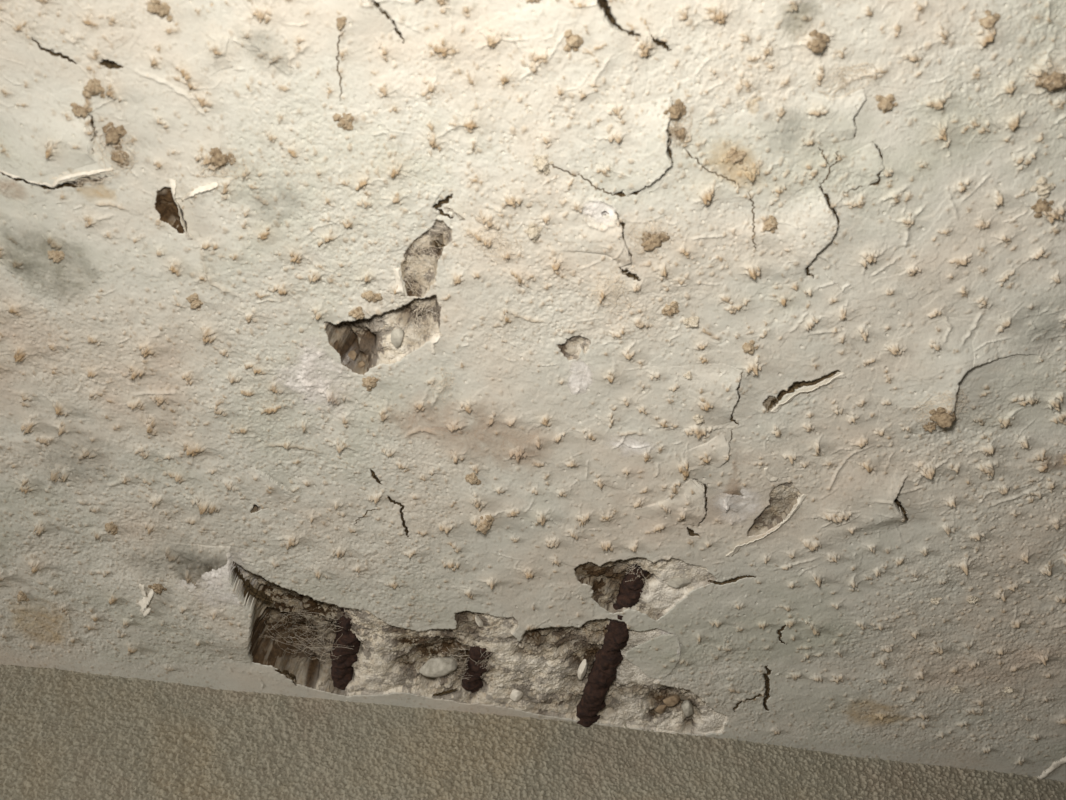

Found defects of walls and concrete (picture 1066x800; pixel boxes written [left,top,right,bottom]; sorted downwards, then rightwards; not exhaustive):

crack [371,0,404,44]
crack [597,0,672,51]
spalling [155,179,218,240]
spalling [324,205,465,375]
peeling [762,372,846,413]
spalling [726,467,807,557]
spalling [231,557,728,735]